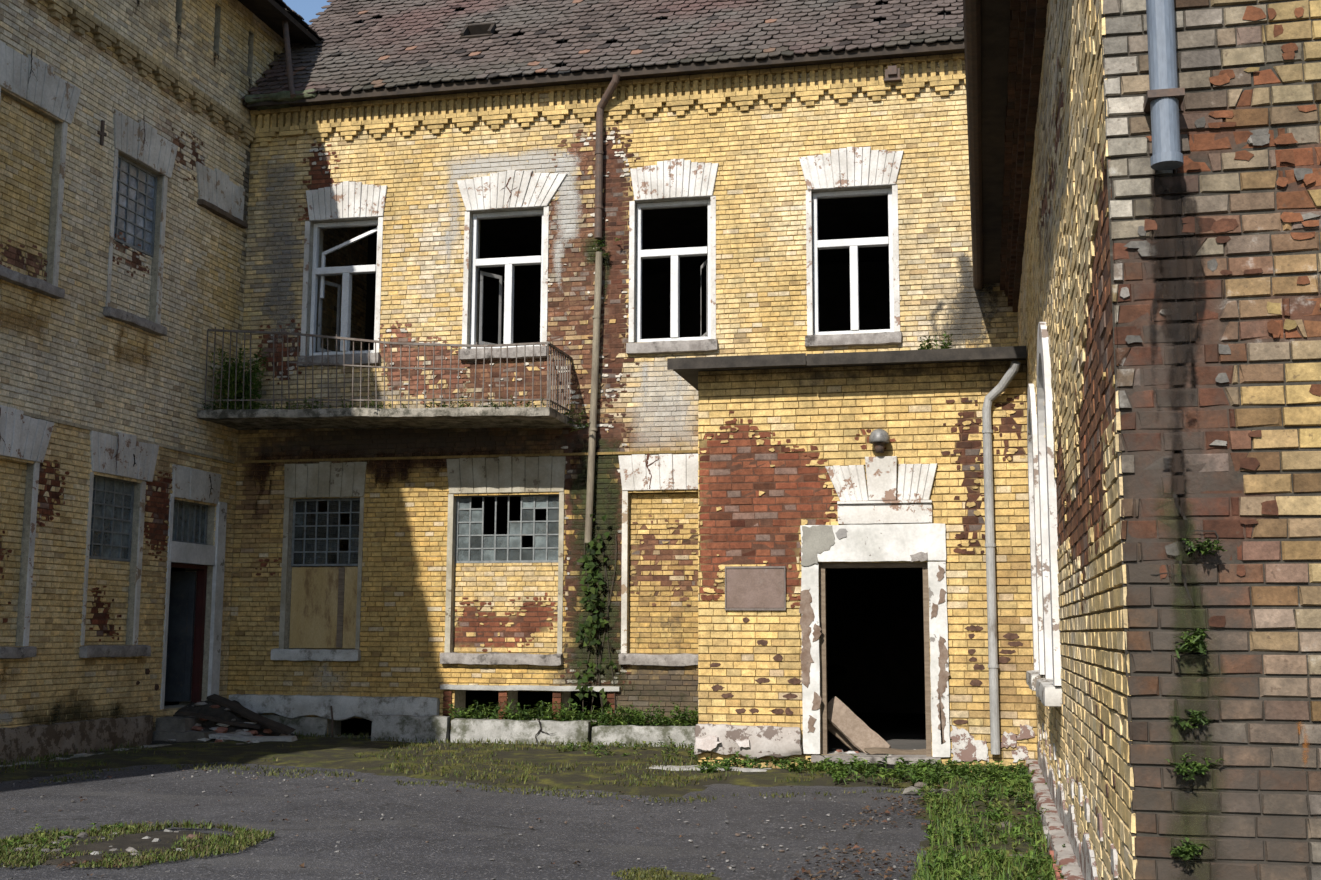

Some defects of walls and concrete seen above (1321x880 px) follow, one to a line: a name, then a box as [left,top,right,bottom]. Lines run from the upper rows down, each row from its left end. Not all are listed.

spalling [298,143,341,221]
spalling [0,240,48,281]
spalling [1054,145,1279,611]
peeling [377,121,848,733]
spalling [31,460,69,526]
spalling [139,471,173,561]
spalling [941,395,1026,554]
damp [1149,169,1215,880]
spalling [89,586,122,641]
peeling [910,552,946,619]
spalling [964,625,1023,686]
peeling [936,636,1119,880]